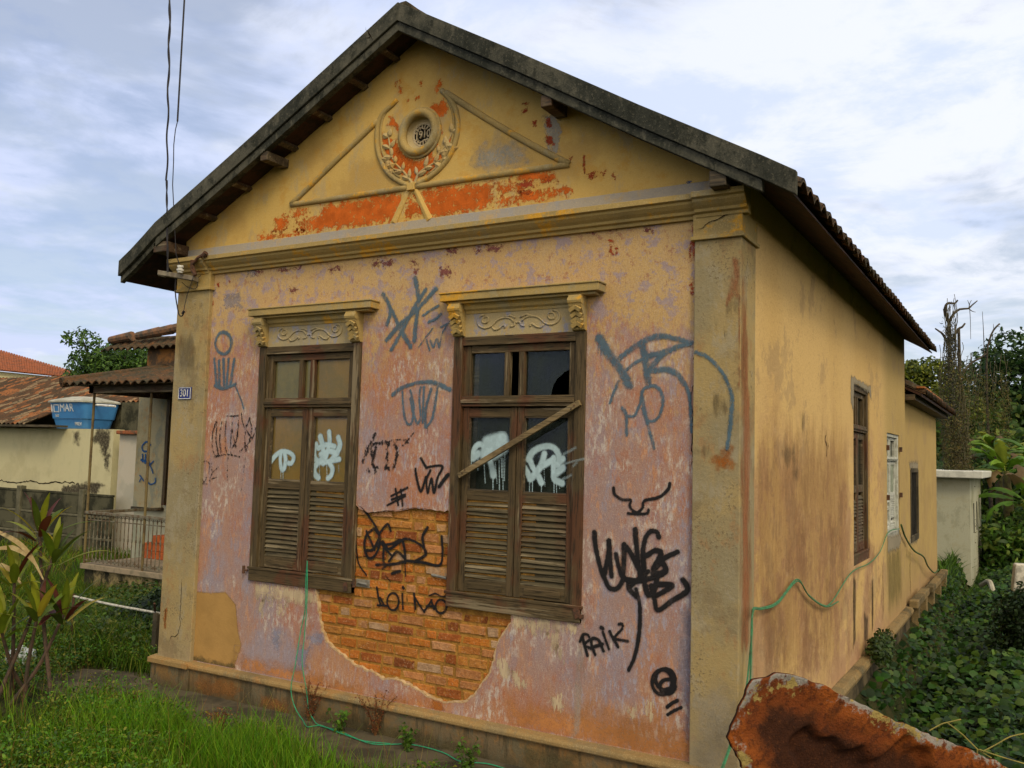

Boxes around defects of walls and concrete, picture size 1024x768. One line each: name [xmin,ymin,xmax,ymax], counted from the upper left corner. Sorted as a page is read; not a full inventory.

peeling [257,78,574,240]
damp [93,428,110,467]
rust [712,310,751,645]
flaking render [254,491,584,704]